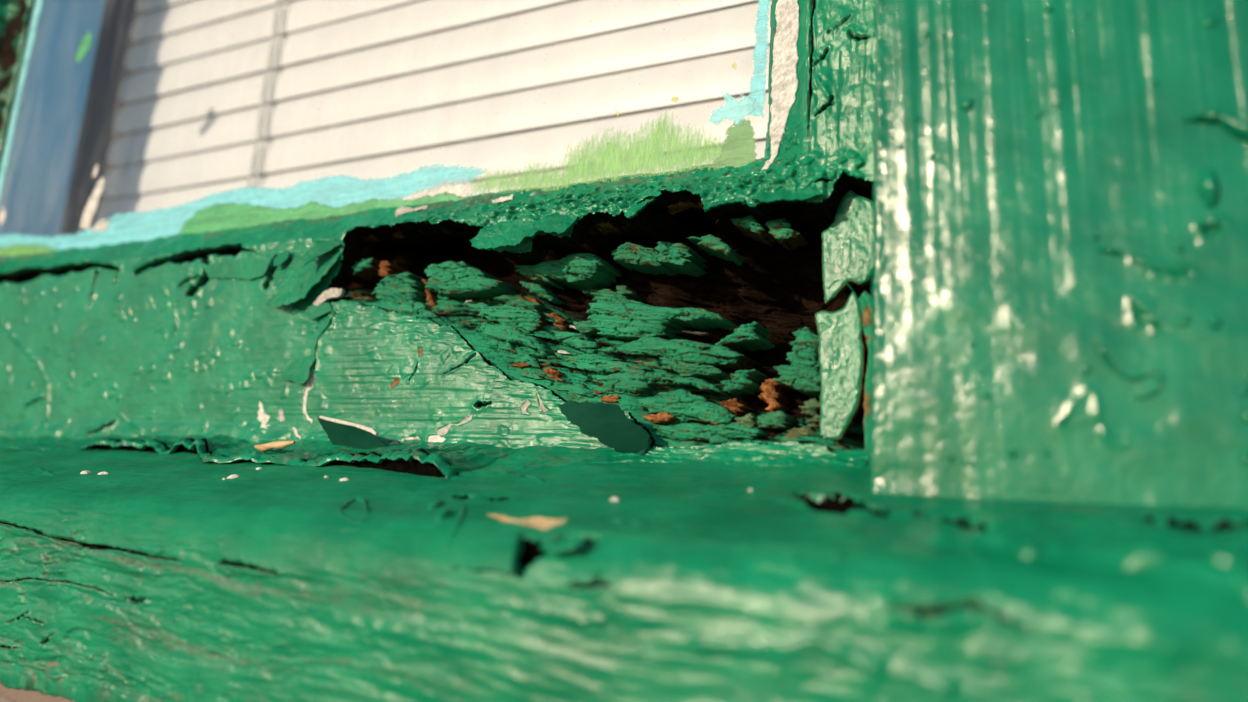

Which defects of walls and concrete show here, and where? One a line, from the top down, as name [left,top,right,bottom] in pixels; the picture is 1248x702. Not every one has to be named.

crack [809,0,870,137]
crack [0,266,120,292]
crack [166,247,254,289]
spalling [257,182,873,454]
crack [0,521,180,561]
peeling [445,514,600,576]
crack [223,562,278,575]
crack [0,578,145,603]
crack [0,612,55,649]